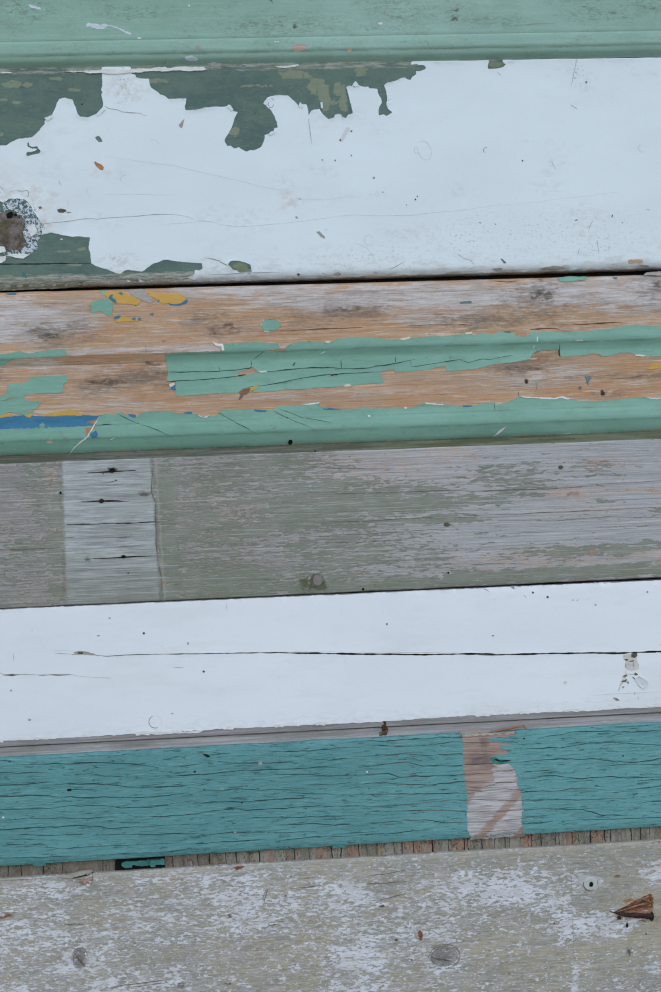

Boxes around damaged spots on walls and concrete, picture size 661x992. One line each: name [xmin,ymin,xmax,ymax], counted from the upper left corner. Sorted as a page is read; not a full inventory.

peeling [0,43,426,156]
peeling [0,224,203,322]
peeling [228,261,252,273]
peeling [0,319,661,456]
crack [1,650,661,695]
crack [0,725,661,901]
peeling [352,729,599,840]